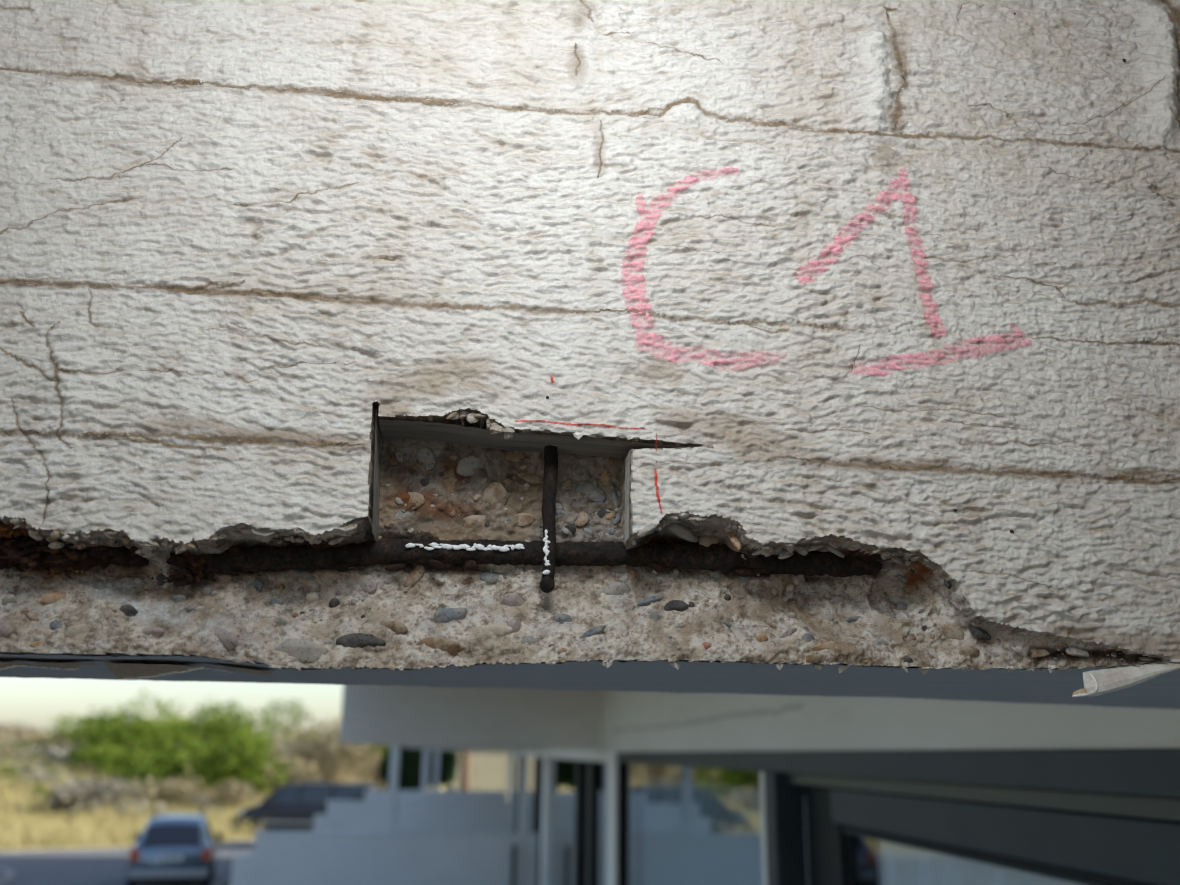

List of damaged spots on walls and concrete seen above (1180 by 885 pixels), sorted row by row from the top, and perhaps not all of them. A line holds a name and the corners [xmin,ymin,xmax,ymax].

spalling [0,401,1180,697]